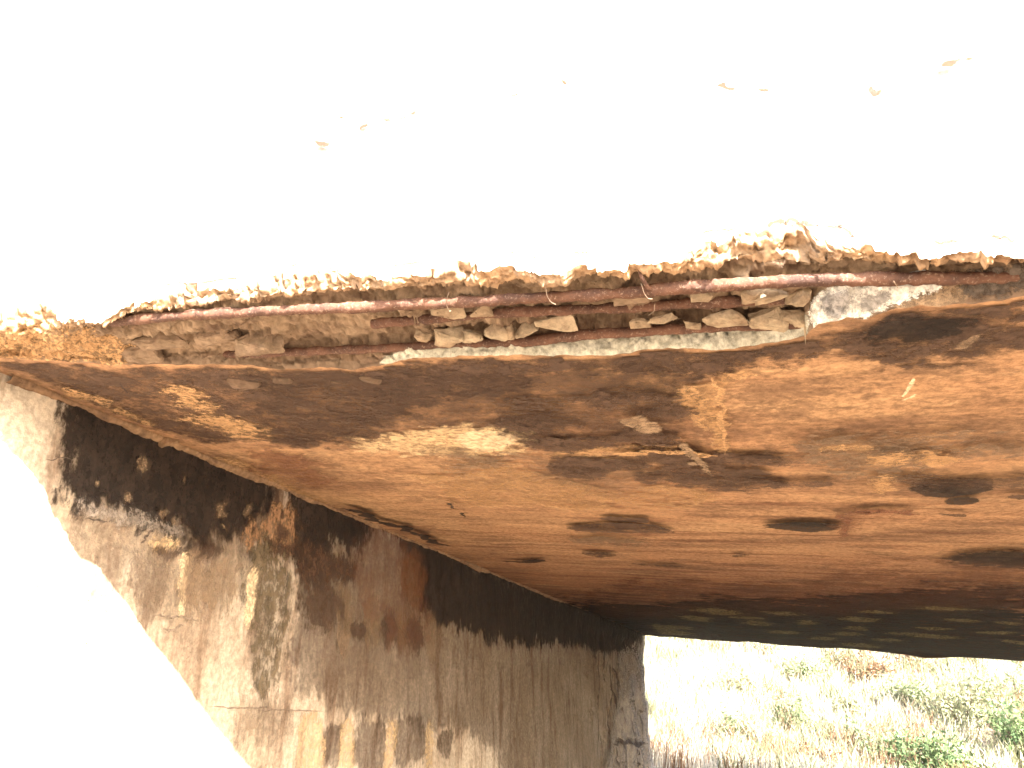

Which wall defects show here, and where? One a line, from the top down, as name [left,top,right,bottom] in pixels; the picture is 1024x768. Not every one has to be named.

spalling [0,223,1024,391]
damp [0,268,1024,661]